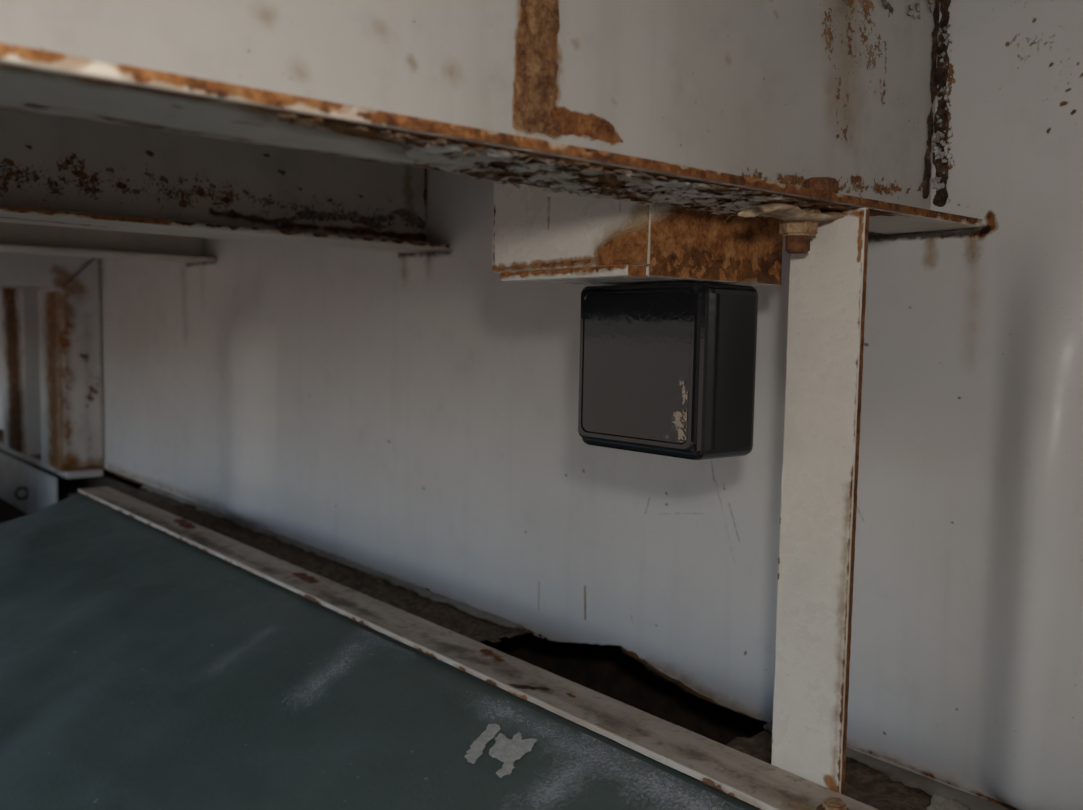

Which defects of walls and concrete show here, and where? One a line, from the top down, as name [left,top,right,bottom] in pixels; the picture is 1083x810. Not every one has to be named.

rust [0,42,73,77]
rust [0,150,451,257]
rust [513,0,623,145]
peeling [380,129,808,220]
rust [822,0,887,141]
rust [918,0,956,207]
rust [0,288,23,453]
rust [39,258,138,483]
rust [70,64,997,795]
rust [975,793,1018,810]